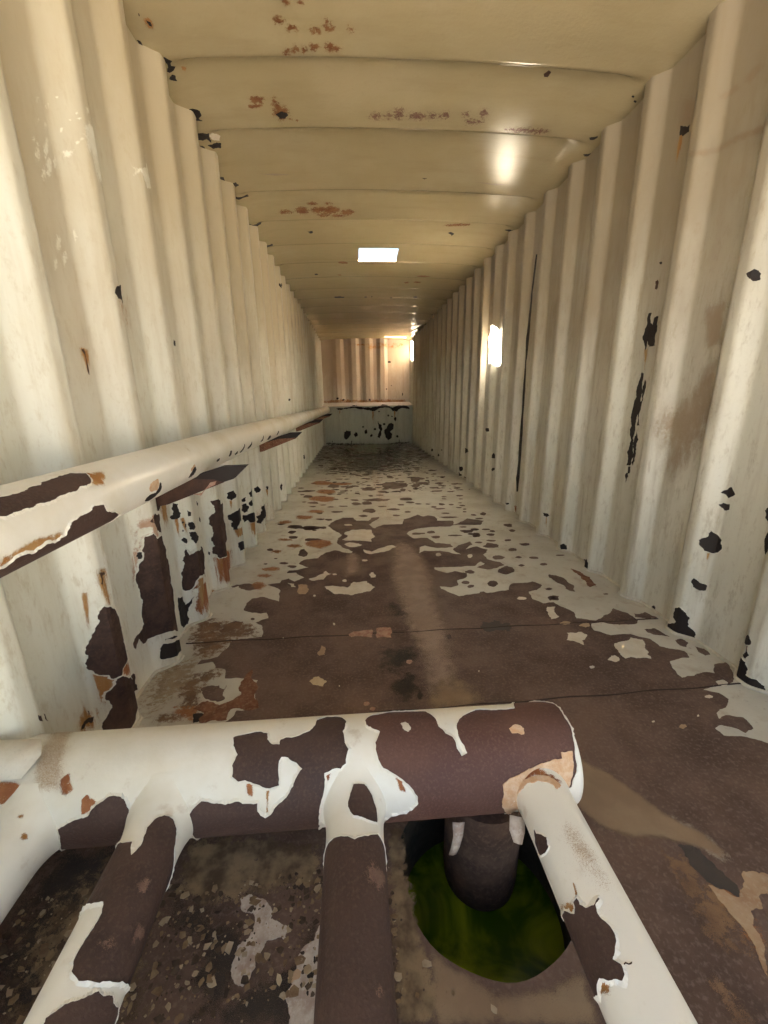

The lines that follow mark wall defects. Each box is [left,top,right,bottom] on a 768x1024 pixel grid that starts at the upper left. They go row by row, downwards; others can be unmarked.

rust [272,0,354,56]
rust [247,93,299,122]
rust [368,106,493,127]
rust [280,199,355,219]
peeling [625,313,658,480]
peeling [336,404,409,440]
peeling [0,466,768,1024]